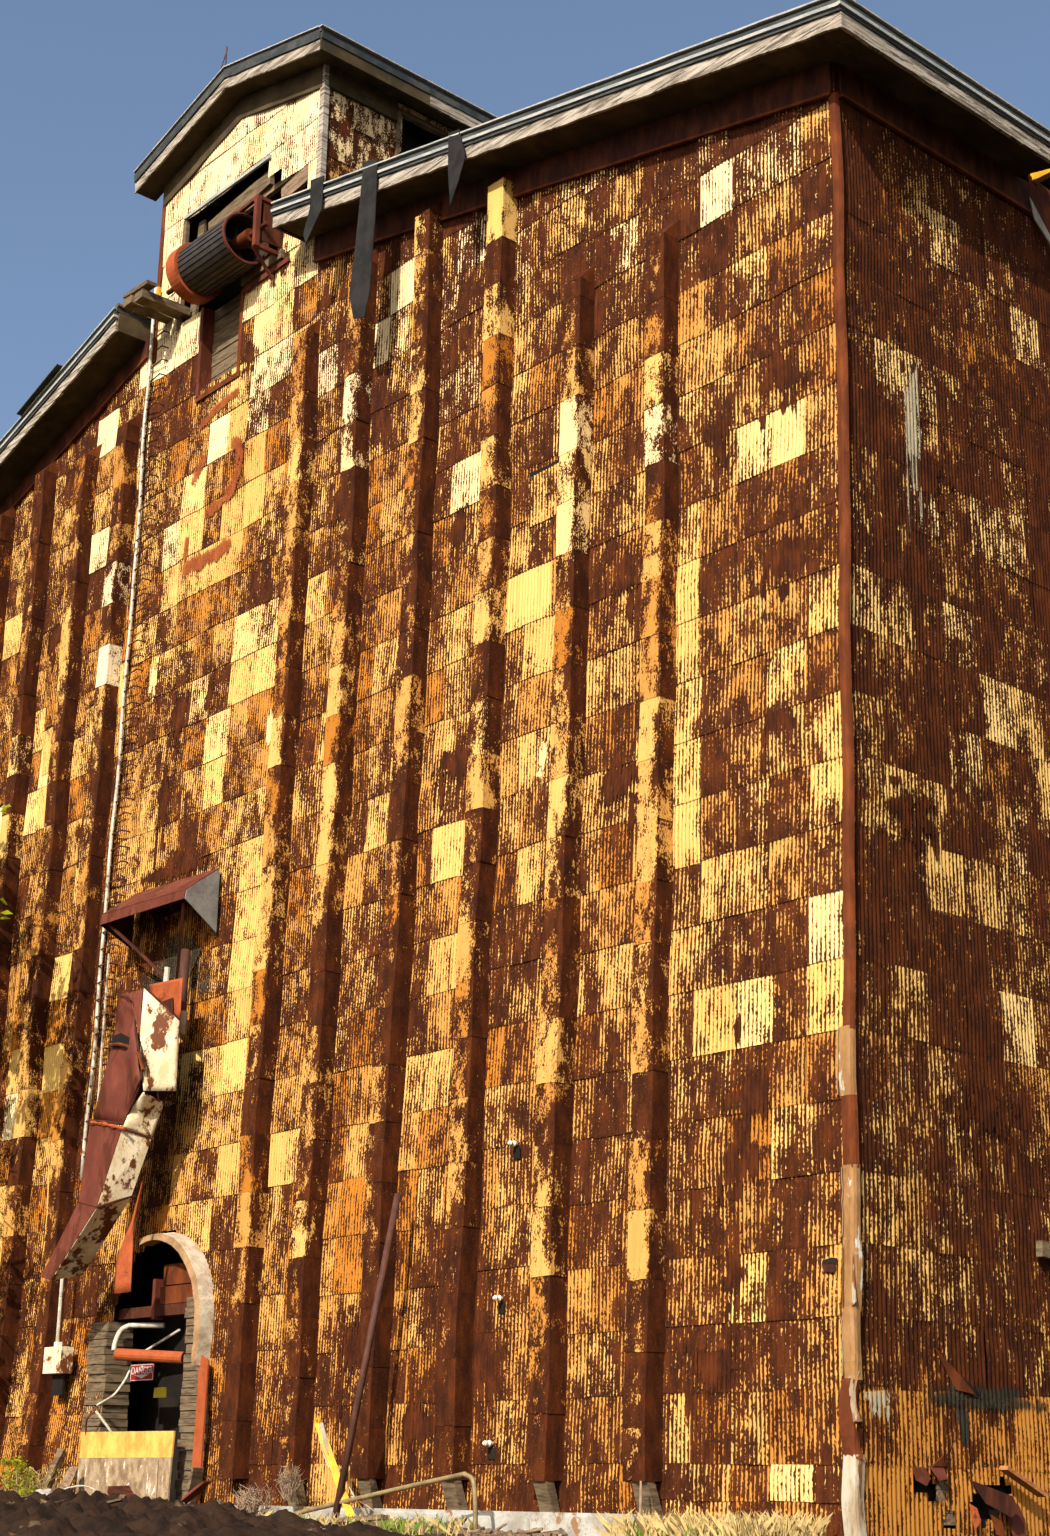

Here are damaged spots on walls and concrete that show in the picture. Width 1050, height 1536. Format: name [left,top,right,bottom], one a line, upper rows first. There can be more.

rust [753,337,807,435]
rust [606,538,644,624]
rust [753,531,840,605]
rust [43,619,62,676]
rust [141,676,218,889]
rust [430,734,468,821]
rust [594,757,638,837]
rust [757,697,800,781]
rust [887,775,941,861]
rust [733,1013,741,1053]
rust [716,1065,784,1208]
rust [682,1243,747,1428]